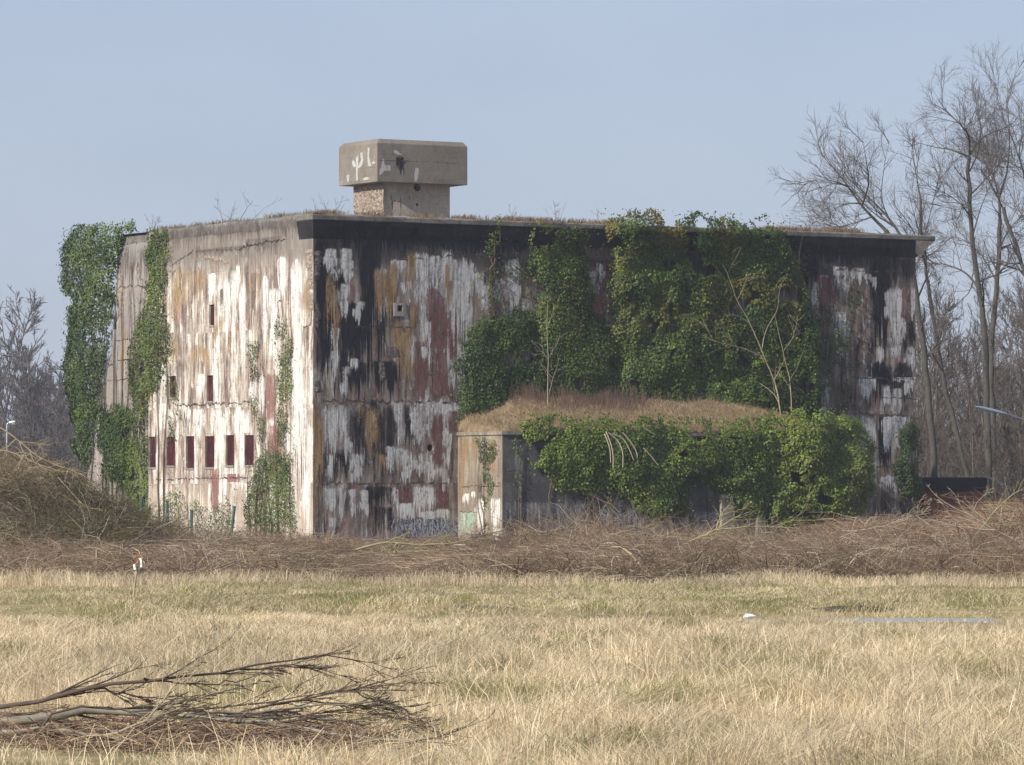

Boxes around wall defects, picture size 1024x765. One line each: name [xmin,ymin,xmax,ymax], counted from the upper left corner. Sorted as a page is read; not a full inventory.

spalling [305,249,323,328]
leakage [158,219,610,540]
peeling [412,288,457,399]
peeling [902,288,911,323]